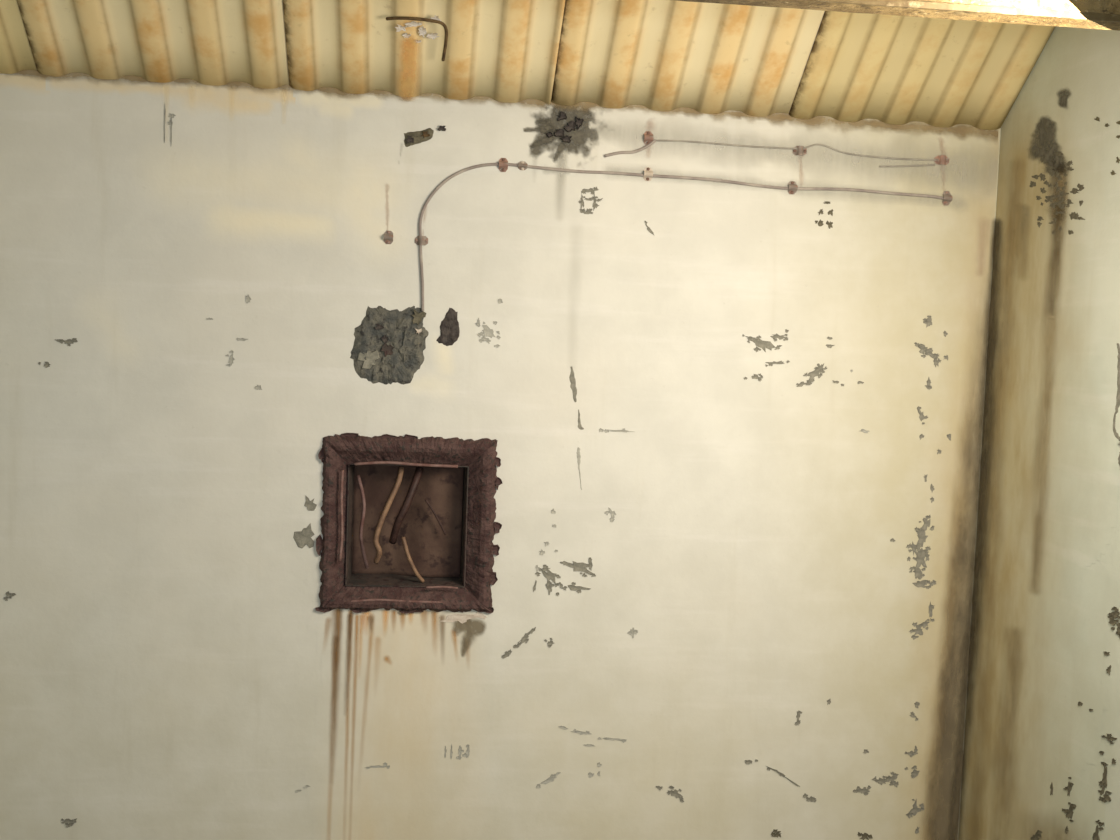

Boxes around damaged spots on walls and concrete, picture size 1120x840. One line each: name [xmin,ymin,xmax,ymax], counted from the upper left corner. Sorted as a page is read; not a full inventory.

spalling [350,306,460,385]
peeling [475,318,501,347]
peeling [742,329,790,382]
peeling [796,364,864,387]
peeling [914,342,948,390]
crack [1112,343,1120,466]
damp [879,89,1120,840]
peeling [533,542,596,596]
peeling [890,474,936,640]
rust [303,608,496,840]
peeling [1098,734,1117,803]
peeling [1050,777,1076,834]